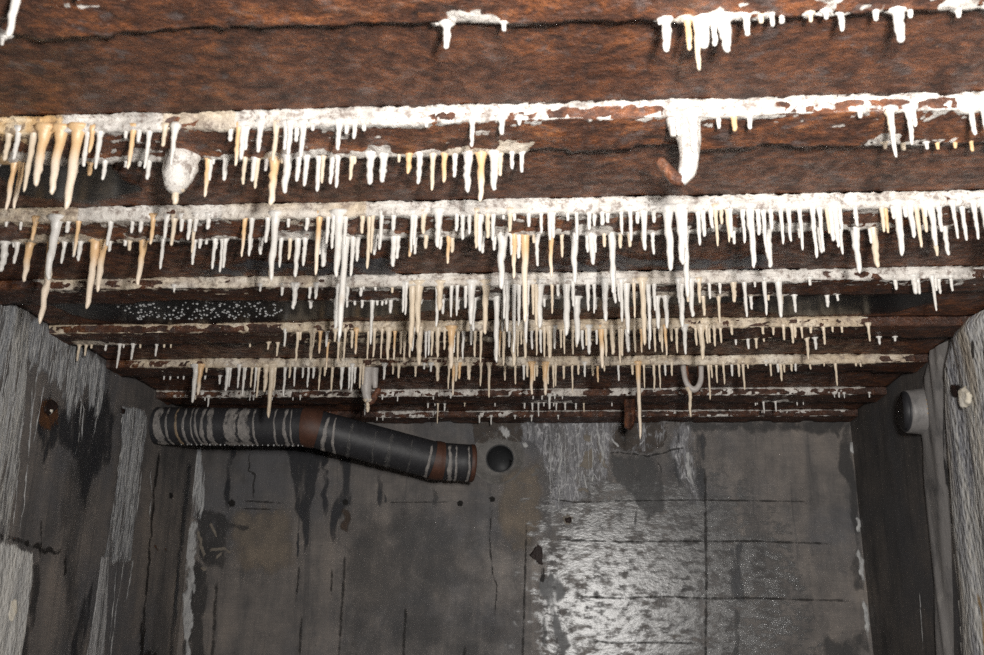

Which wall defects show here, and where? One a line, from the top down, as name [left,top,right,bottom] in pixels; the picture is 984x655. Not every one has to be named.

water stain [103,323,211,335]
water stain [217,322,251,334]
water stain [190,408,218,446]
water stain [223,408,259,459]
water stain [376,403,449,424]
water stain [465,410,525,425]
water stain [748,394,821,413]
water stain [192,448,205,518]
water stain [282,410,354,555]
water stain [447,446,471,482]
water stain [183,522,198,655]
water stain [854,550,864,589]